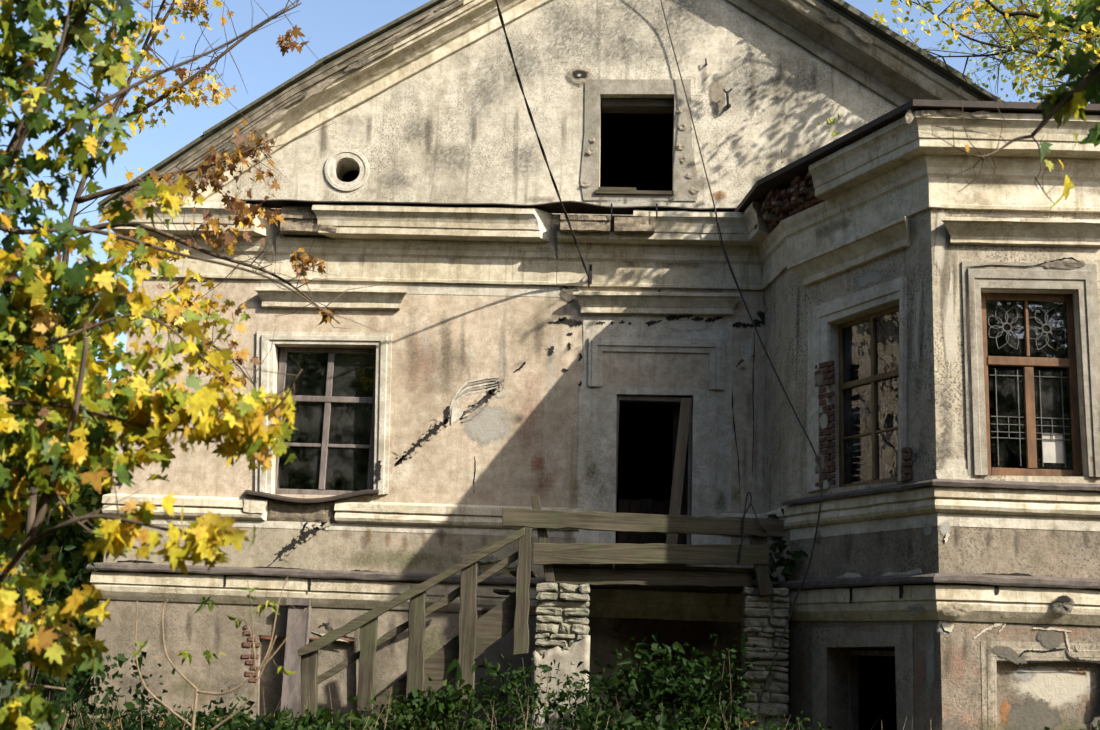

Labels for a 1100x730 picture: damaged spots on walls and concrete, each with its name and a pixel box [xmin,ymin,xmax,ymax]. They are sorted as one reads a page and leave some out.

flaking render [754,172,825,233]
spalling [559,286,579,303]
spalling [548,317,583,361]
spalling [645,311,765,370]
crack [373,362,526,482]
peeling [450,377,510,446]
flaking render [807,360,836,487]
flaking render [898,447,918,482]
peeling [935,458,976,480]
crack [117,557,155,565]
crack [251,521,331,569]
peeling [991,645,1100,730]